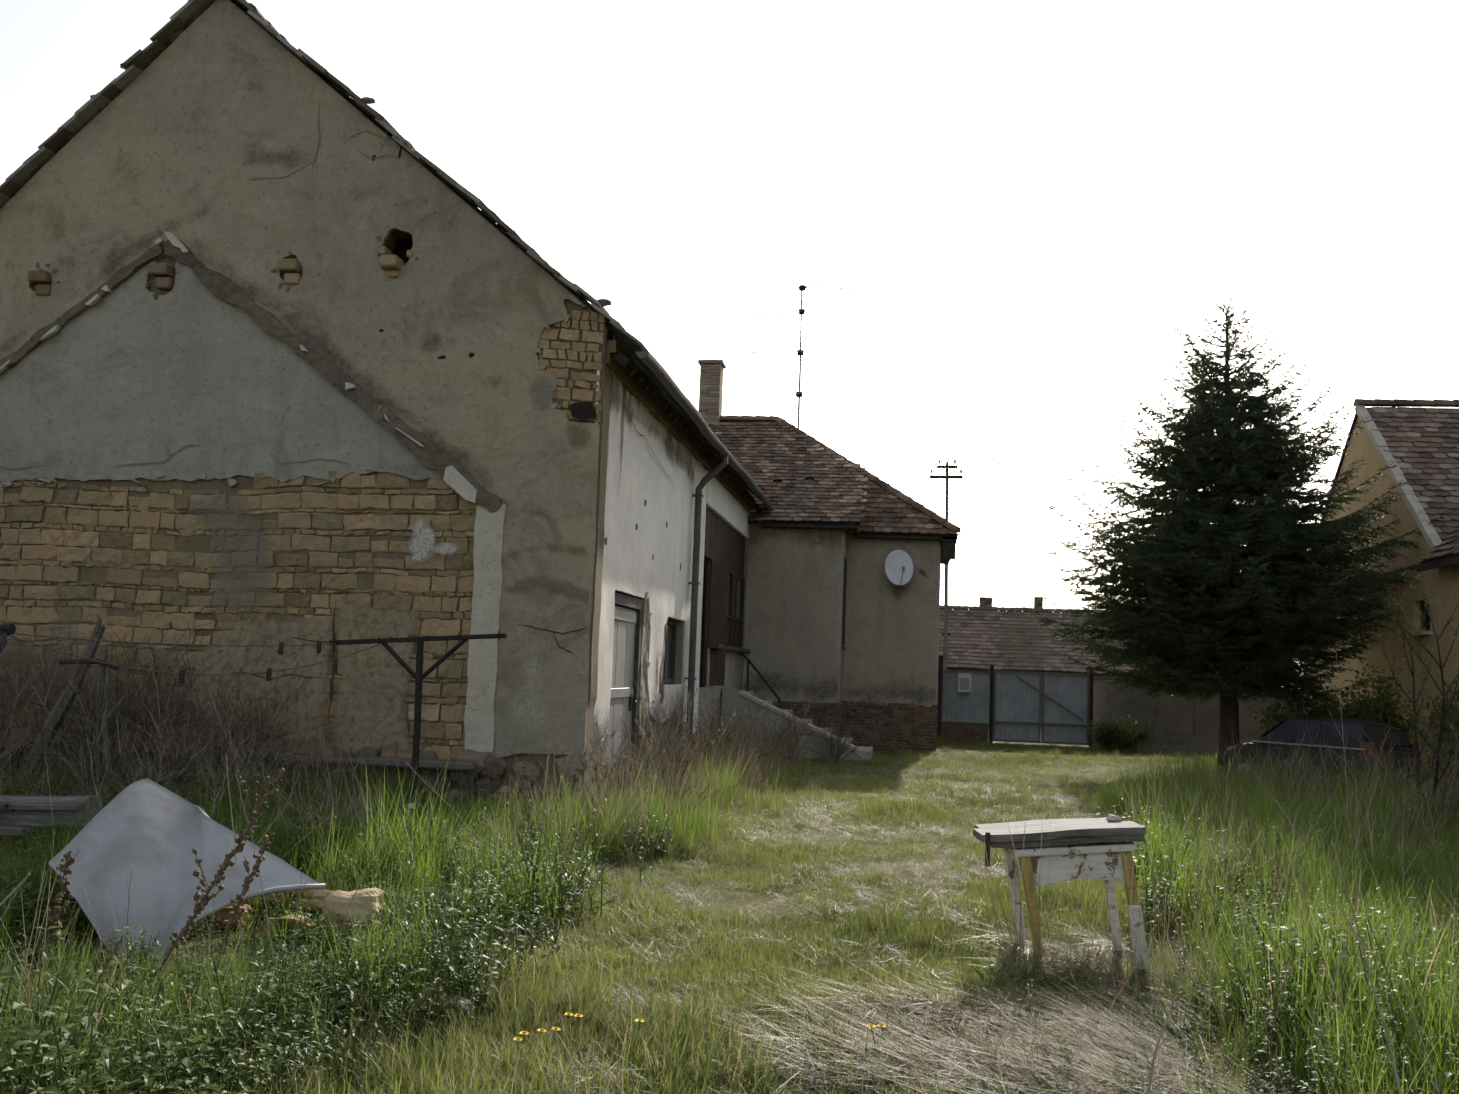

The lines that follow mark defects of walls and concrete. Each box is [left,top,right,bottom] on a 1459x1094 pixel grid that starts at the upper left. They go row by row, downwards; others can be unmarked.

crack [250,104,416,180]
spalling [376,236,418,278]
spalling [534,310,606,445]
spalling [0,466,478,760]
crack [517,624,587,654]